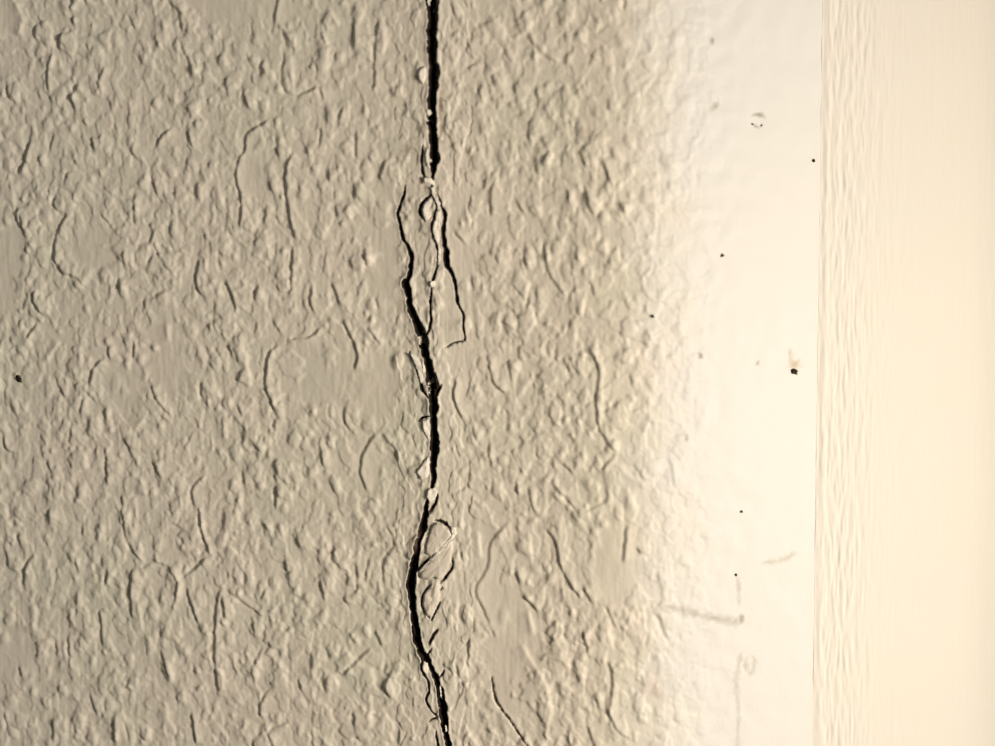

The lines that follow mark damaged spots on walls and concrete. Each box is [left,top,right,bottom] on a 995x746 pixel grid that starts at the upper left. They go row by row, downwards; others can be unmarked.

crack [396,0,466,746]